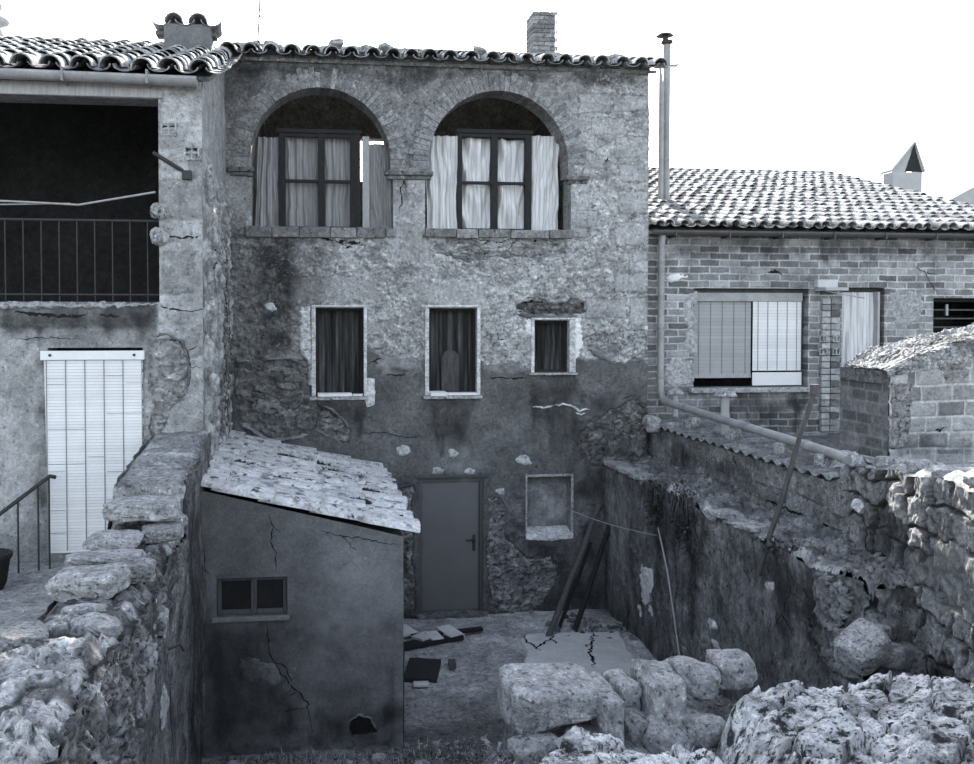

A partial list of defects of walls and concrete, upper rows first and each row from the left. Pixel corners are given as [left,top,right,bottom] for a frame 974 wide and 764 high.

spalling [516,296,586,319]
spalling [148,333,191,437]
spalling [231,356,352,444]
spalling [532,398,649,468]
crack [269,516,281,566]
crack [319,530,395,550]
spalling [400,529,415,612]
spalling [486,488,558,613]
crack [266,622,312,728]
spalling [403,624,465,641]
crack [523,632,557,649]
crack [585,633,596,668]